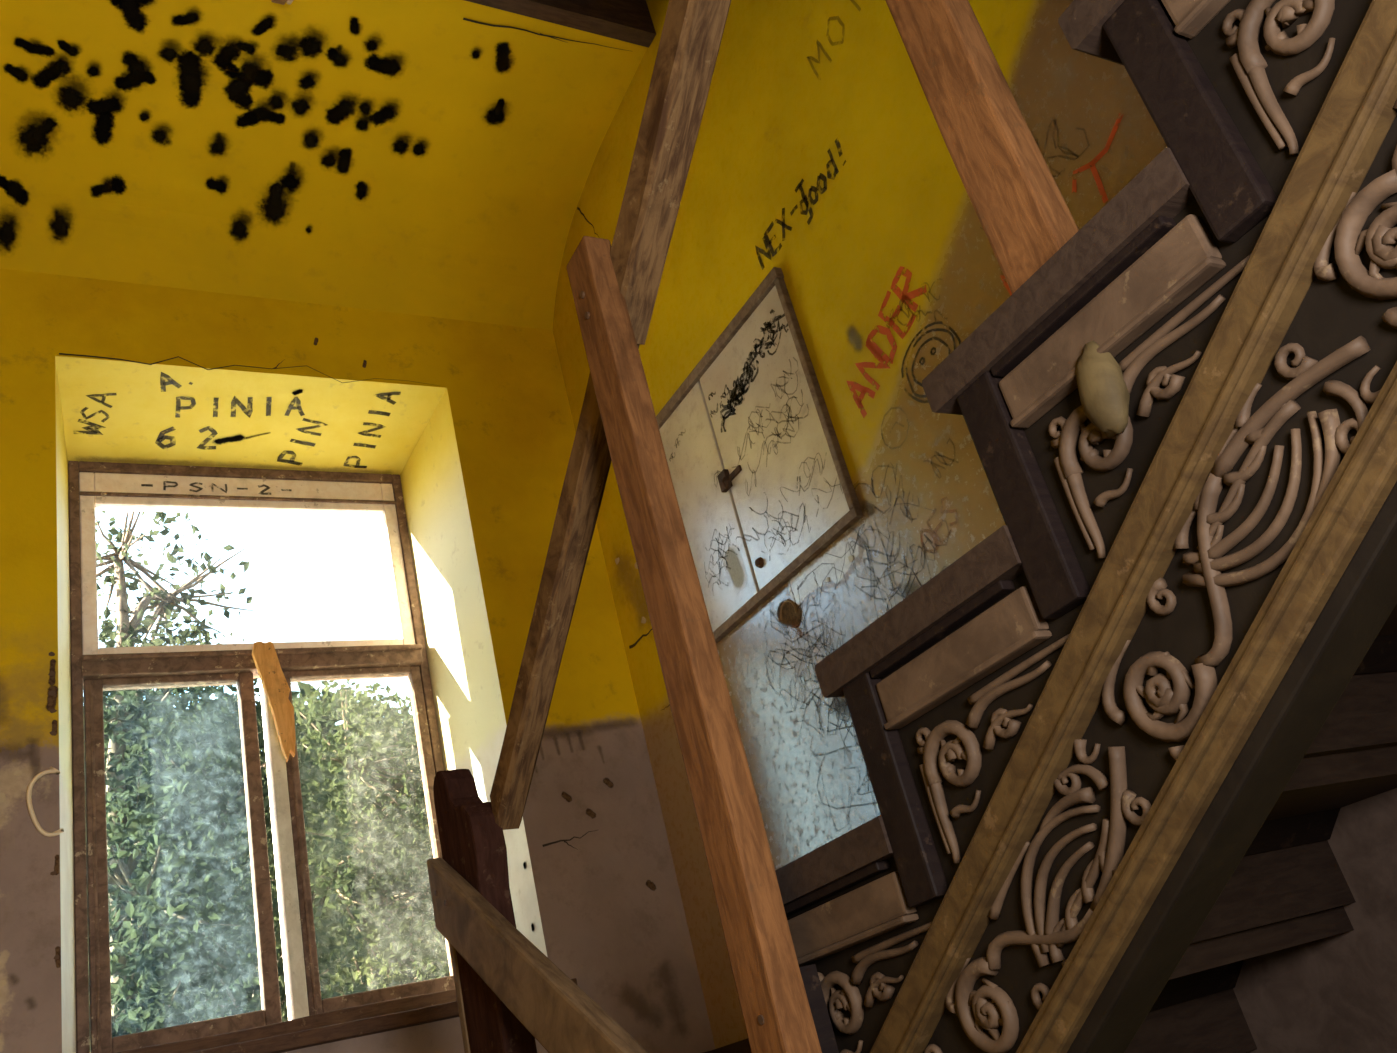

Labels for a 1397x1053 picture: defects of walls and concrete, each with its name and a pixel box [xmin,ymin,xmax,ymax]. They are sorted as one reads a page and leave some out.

peeling [777,531,863,628]
peeling [0,751,55,913]
flaking render [50,855,59,875]
peeling [0,946,21,1053]